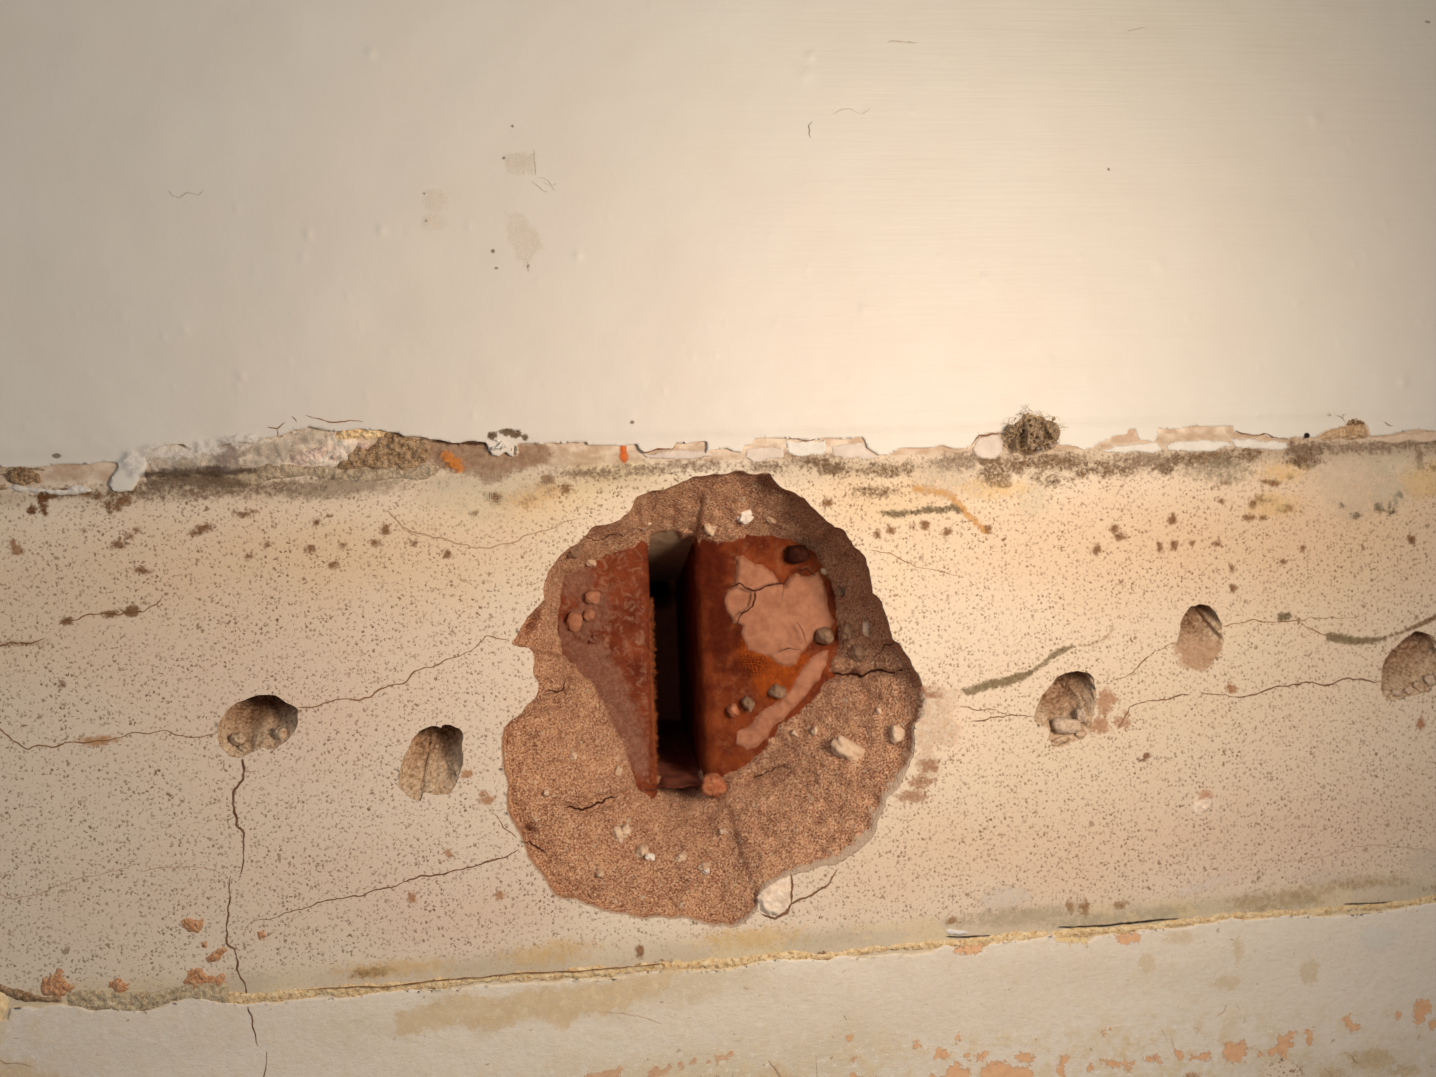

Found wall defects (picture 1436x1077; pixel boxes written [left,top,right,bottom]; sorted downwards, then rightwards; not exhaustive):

water stain [27,481,327,518]
peeling [146,427,440,489]
water stain [426,439,720,503]
water stain [743,455,991,538]
peeling [972,434,1003,460]
water stain [932,440,1436,520]
peeling [1104,438,1288,453]
crack [299,635,509,708]
spalling [501,440,926,928]
crack [960,706,1031,722]
crack [1112,642,1379,729]
crack [0,728,519,1077]